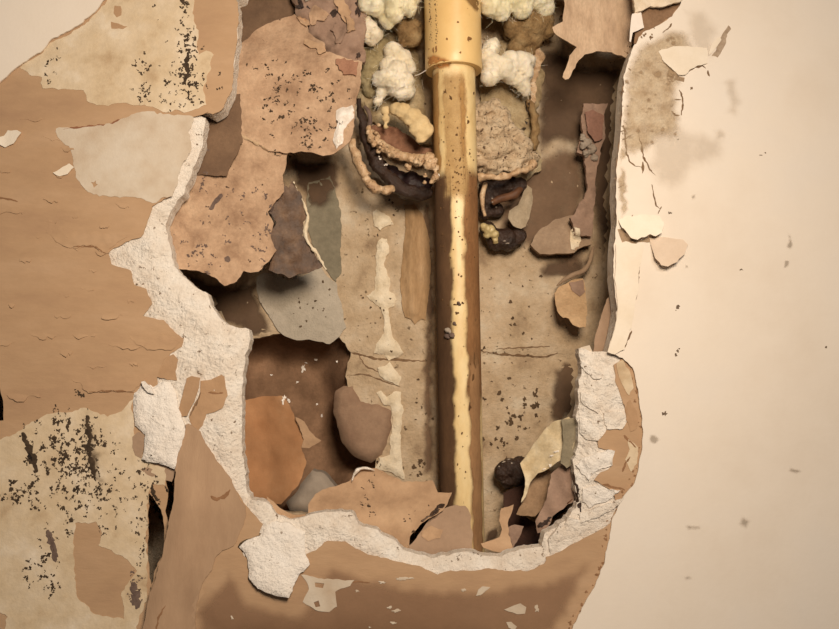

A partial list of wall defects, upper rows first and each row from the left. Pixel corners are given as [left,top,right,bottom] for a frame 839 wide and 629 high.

peeling [0,0,249,453]
water stain [131,0,223,112]
water stain [246,59,357,150]
water stain [500,152,584,243]
water stain [540,27,687,243]
peeling [659,46,708,84]
peeling [195,0,688,629]
water stain [1,404,174,609]
peeling [73,462,176,629]